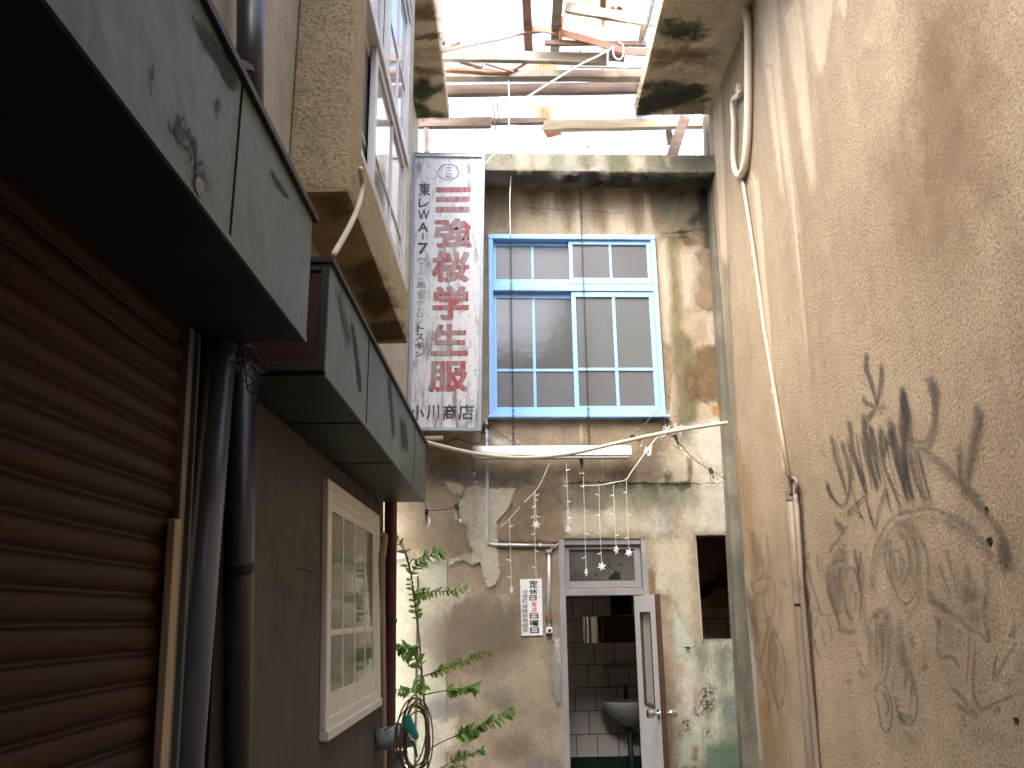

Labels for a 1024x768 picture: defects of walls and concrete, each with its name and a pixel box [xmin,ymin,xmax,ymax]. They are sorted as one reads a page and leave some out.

damp [413,4,447,121]
damp [514,0,764,768]
damp [751,171,776,385]
damp [755,0,847,359]
peeling [430,482,516,588]